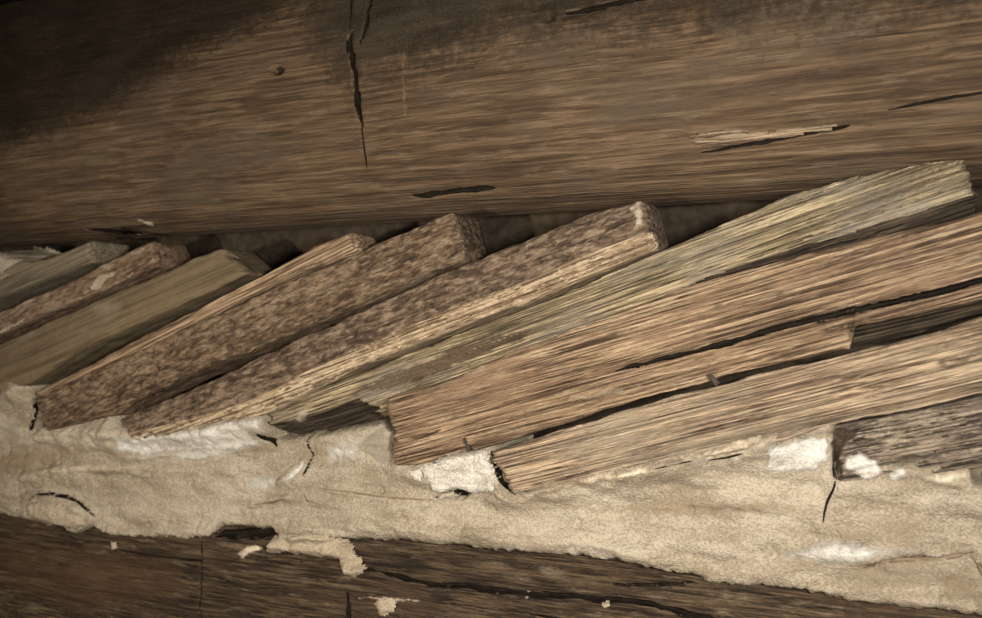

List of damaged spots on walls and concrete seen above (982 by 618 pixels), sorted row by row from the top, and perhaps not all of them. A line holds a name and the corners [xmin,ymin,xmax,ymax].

crack [565,0,639,15]
crack [346,0,372,168]
crack [889,91,982,110]
crack [30,492,94,516]
crack [823,481,836,522]